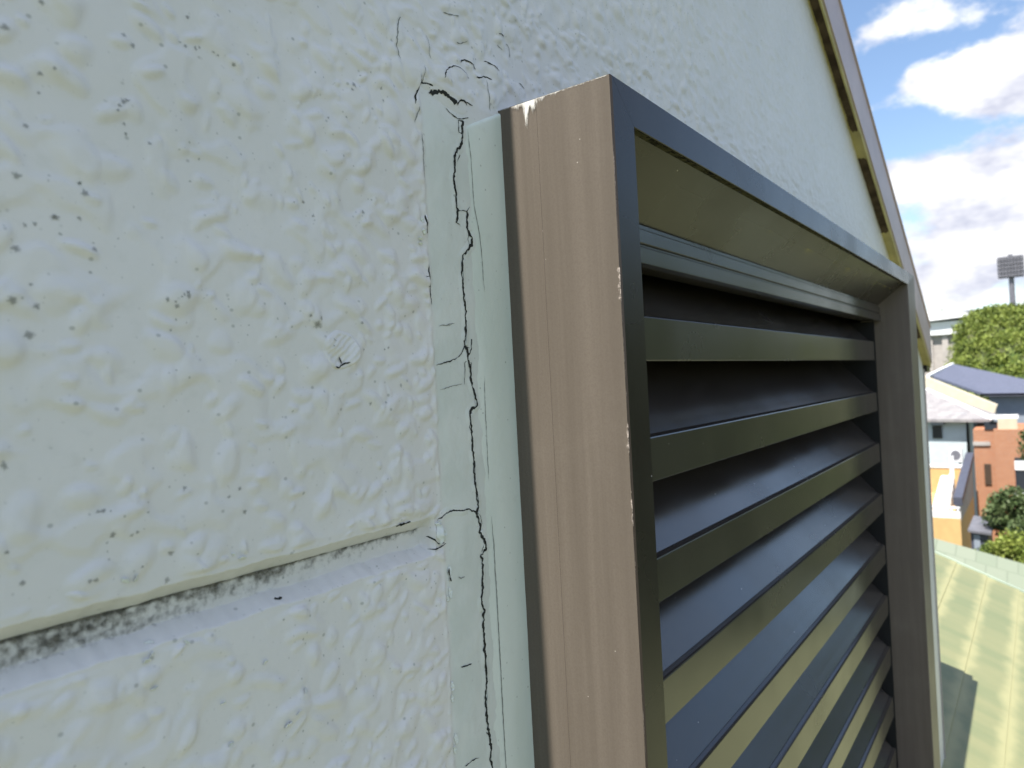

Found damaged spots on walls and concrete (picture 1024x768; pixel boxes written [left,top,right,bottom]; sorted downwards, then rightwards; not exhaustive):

damp [0,528,417,658]
crack [396,33,510,768]